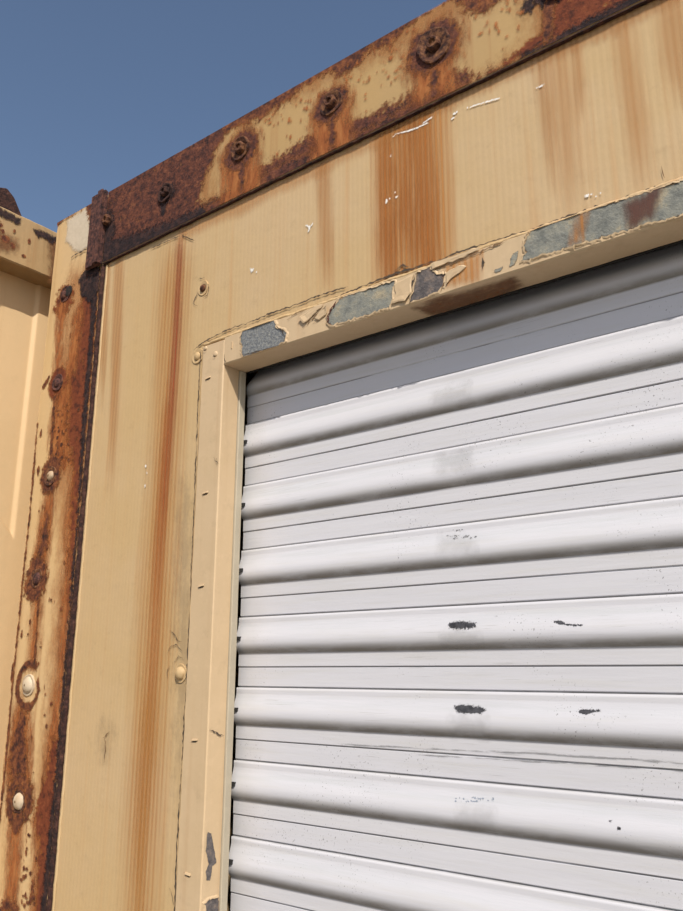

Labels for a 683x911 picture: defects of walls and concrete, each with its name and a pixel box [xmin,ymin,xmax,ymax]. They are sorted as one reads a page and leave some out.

rust [103,0,640,280]
rust [0,207,26,258]
rust [28,204,91,281]
peeling [66,209,90,259]
peeling [494,179,683,273]
peeling [239,242,502,358]
rust [0,266,100,911]
rust [136,264,181,855]
peeling [202,894,219,911]
peeling [206,832,216,881]